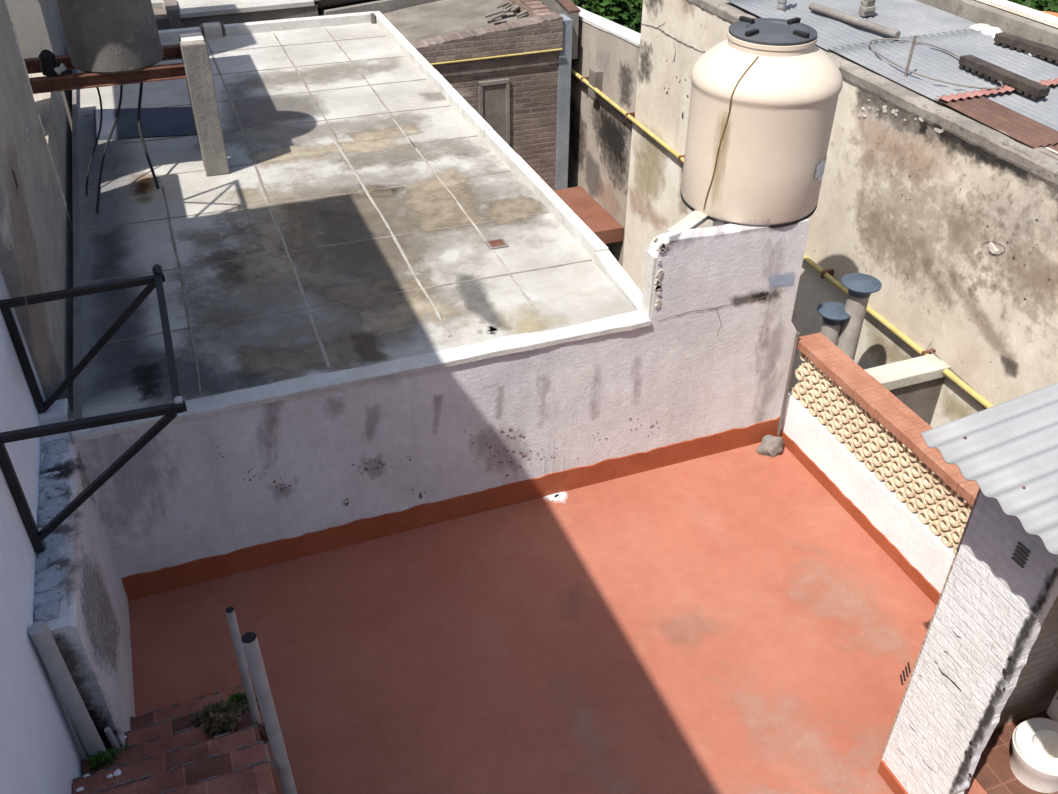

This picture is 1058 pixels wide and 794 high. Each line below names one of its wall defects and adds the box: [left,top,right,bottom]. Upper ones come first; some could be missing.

leakage [857,89,1058,198]
leakage [80,64,544,400]
spalling [653,237,668,309]
crack [659,288,791,336]
leakage [939,278,1017,376]
leakage [43,452,92,498]
leakage [48,559,119,669]
leakage [54,637,117,750]